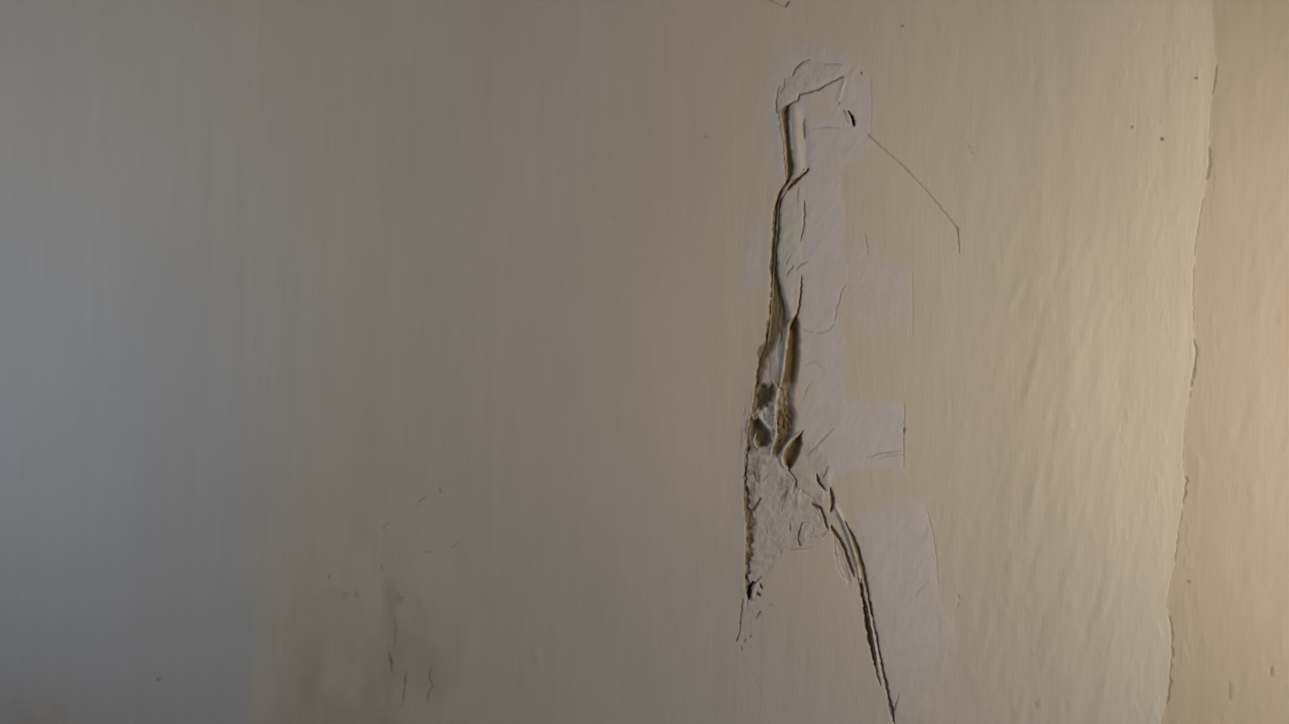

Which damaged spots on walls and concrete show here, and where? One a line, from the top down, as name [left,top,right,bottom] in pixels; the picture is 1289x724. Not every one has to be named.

peeling [730,58,900,724]